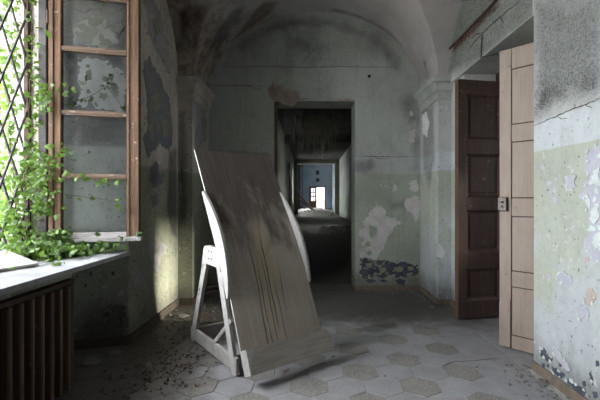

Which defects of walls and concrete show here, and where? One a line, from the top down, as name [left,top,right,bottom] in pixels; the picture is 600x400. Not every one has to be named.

crack [468,2,519,51]
leakage [450,0,600,107]
peeling [142,0,174,208]
peeling [408,111,430,143]
crack [534,98,600,126]
peeling [403,179,420,221]
peeling [565,143,600,263]
peeling [358,205,419,285]
peeling [538,346,598,399]